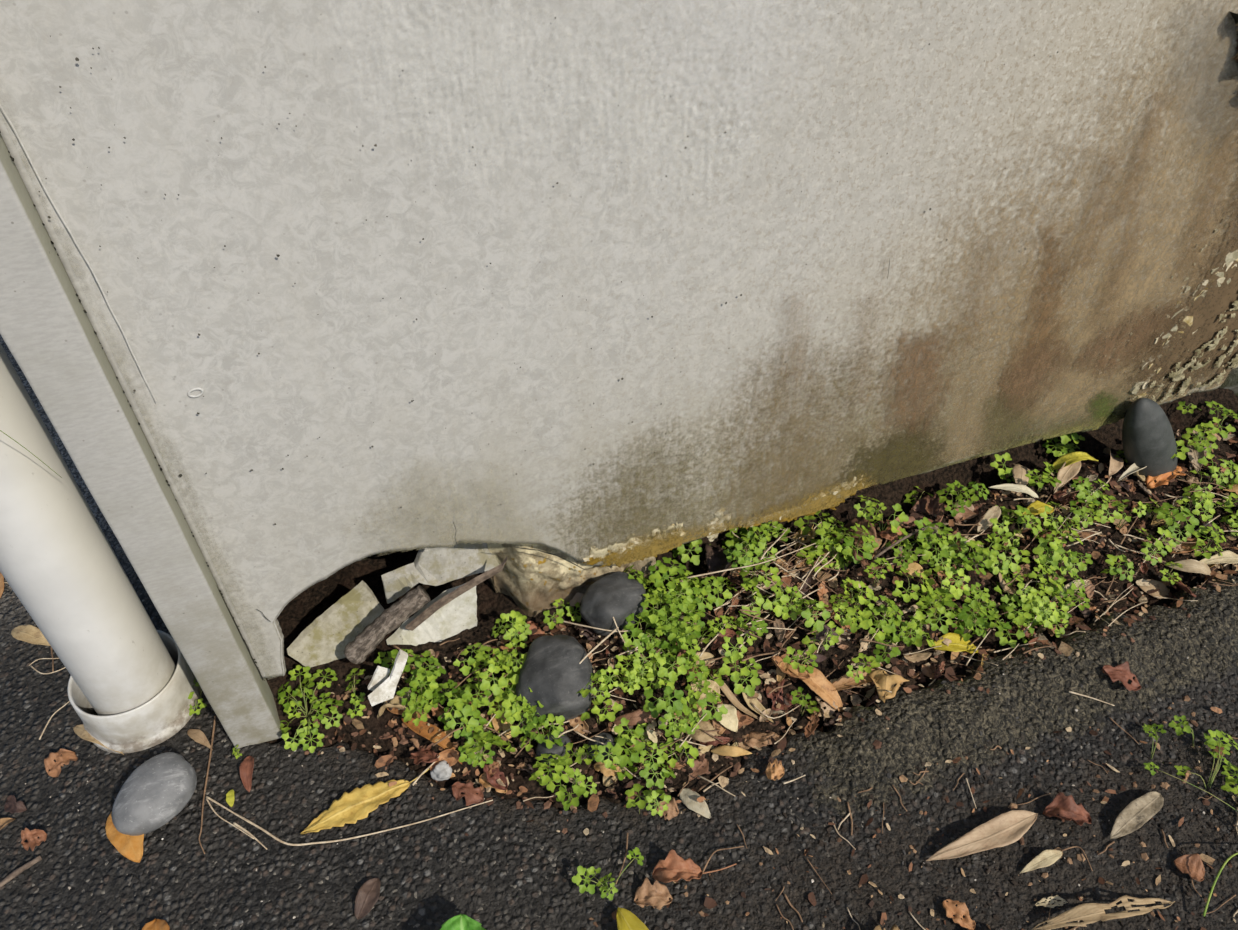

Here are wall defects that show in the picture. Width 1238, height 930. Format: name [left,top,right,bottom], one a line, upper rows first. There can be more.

peeling [1114,219,1238,403]
damp [593,373,1032,549]
spalling [273,591,302,676]
spalling [368,649,408,706]